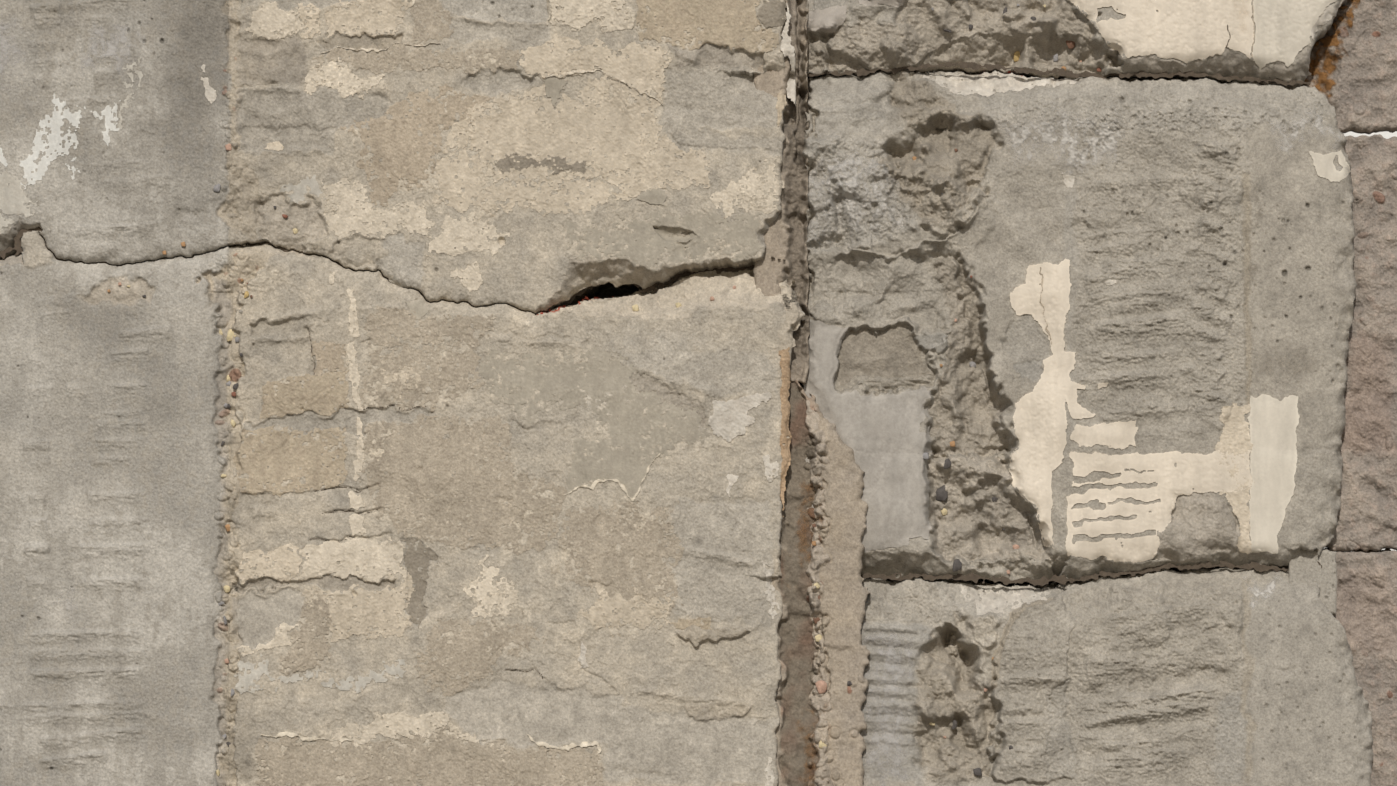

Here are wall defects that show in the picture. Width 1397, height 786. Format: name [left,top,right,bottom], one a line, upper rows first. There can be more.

rust [1301,0,1360,97]
peeling [1309,150,1351,182]
crack [0,226,754,315]
spalling [197,0,1300,786]